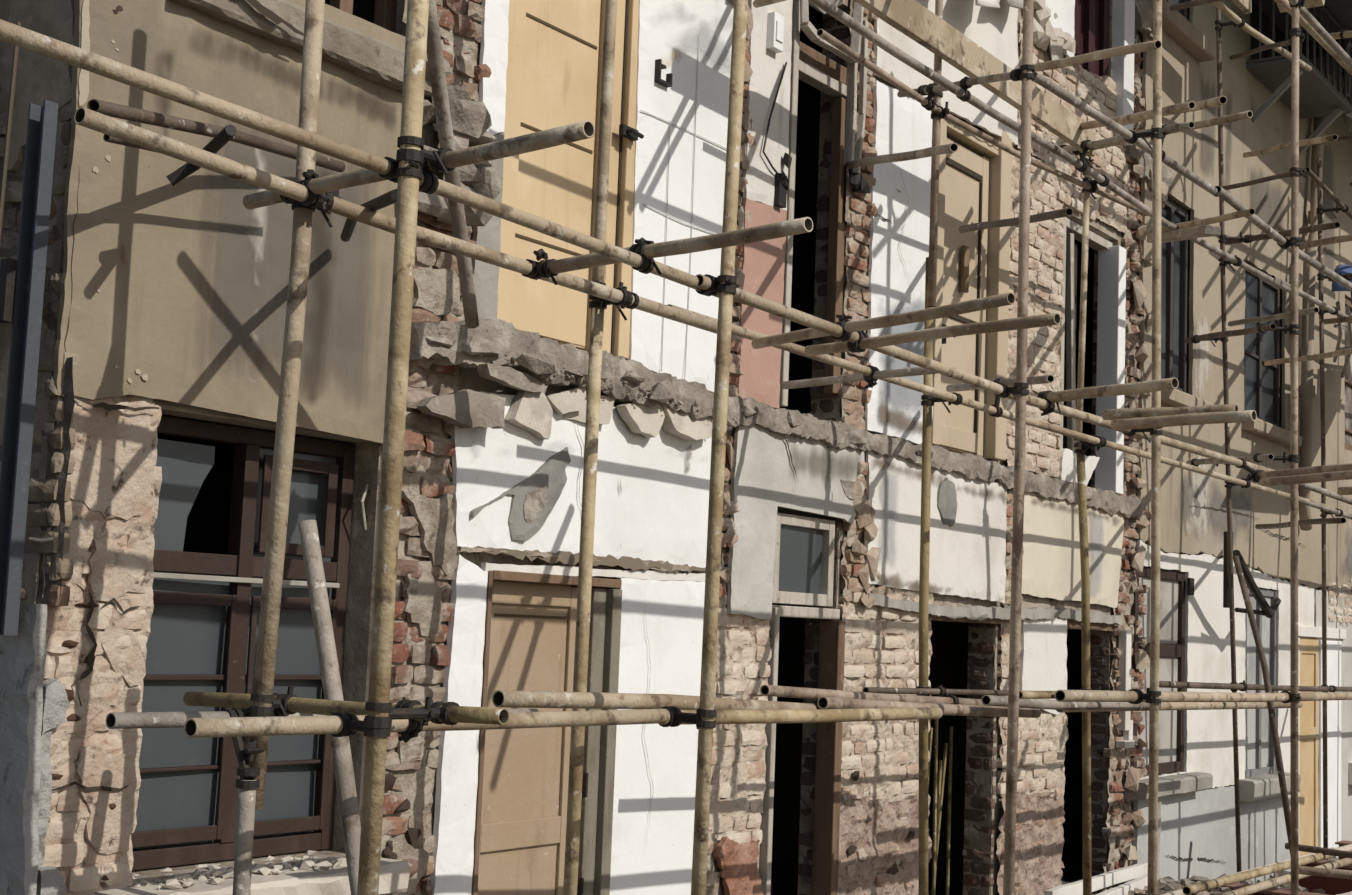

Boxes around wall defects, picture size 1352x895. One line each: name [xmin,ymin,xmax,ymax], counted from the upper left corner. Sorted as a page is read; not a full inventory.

crack [246,0,304,36]
spalling [422,0,497,151]
spalling [411,160,503,322]
spalling [1006,0,1168,478]
spalling [42,364,162,895]
crack [75,583,140,707]
spalling [389,358,461,705]
spalling [533,367,772,701]
spalling [837,451,934,695]
spalling [706,724,768,895]
spalling [838,719,932,895]
spalling [1102,711,1147,884]